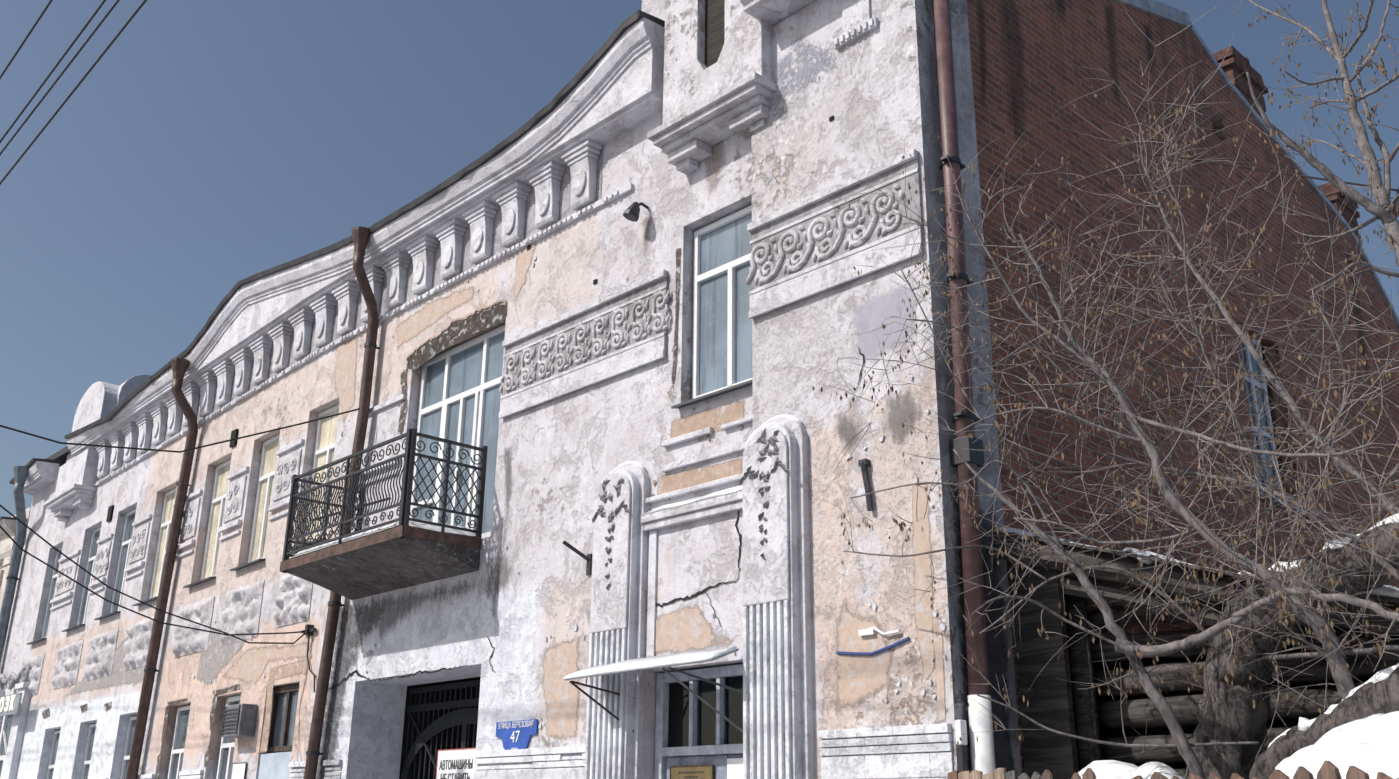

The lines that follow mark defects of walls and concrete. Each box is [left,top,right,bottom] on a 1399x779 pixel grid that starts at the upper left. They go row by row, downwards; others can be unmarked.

crack [646,511,741,626]
peeling [538,602,591,739]
peeling [646,604,735,655]
peeling [835,600,901,710]